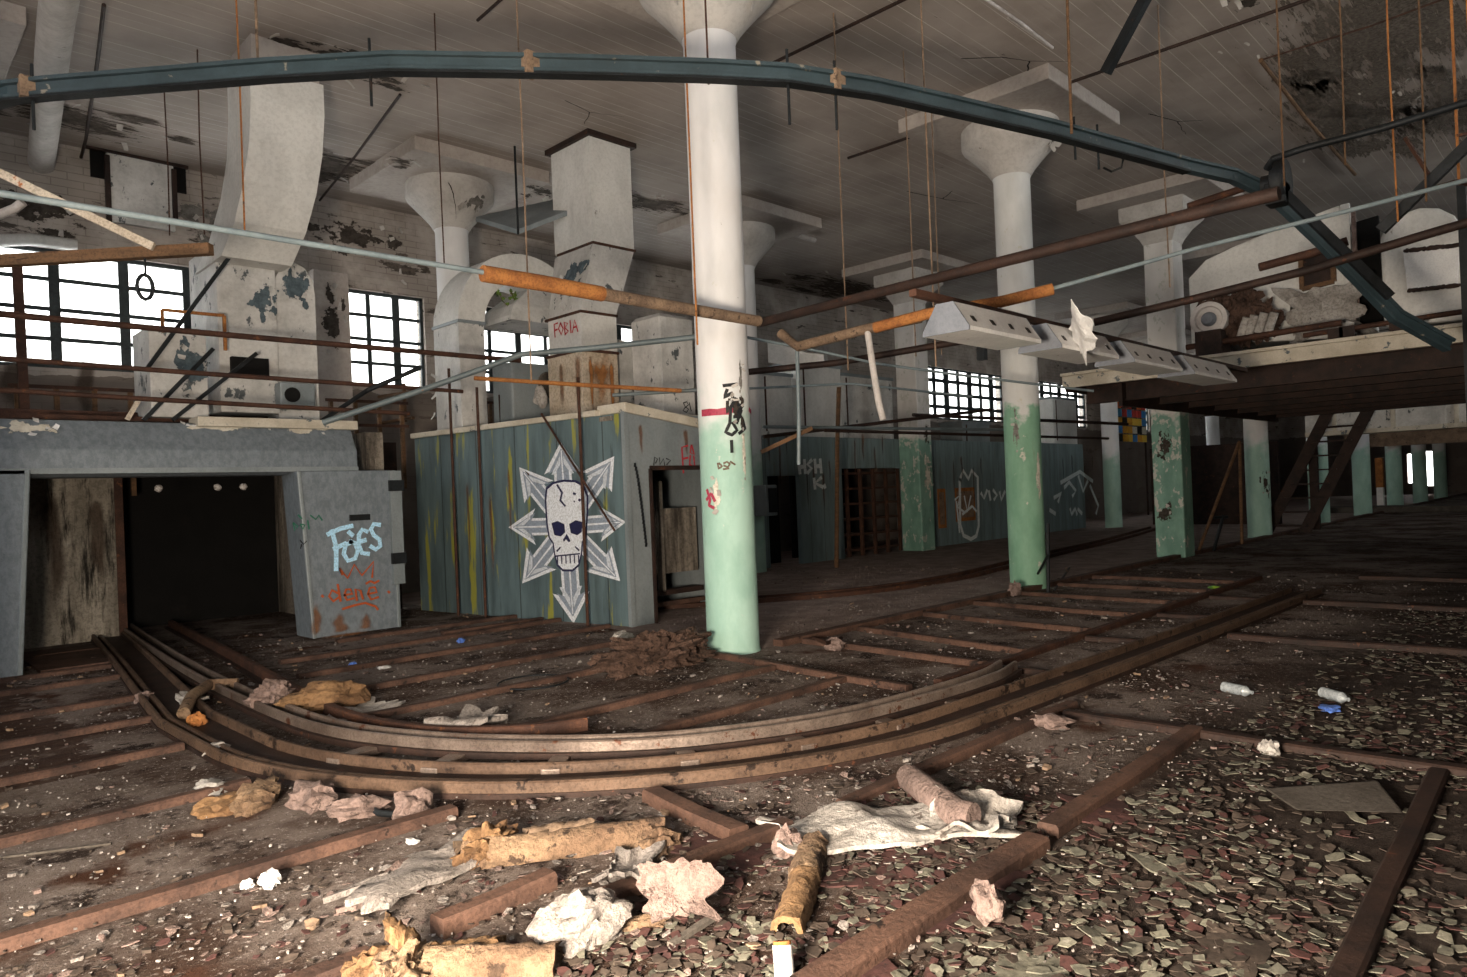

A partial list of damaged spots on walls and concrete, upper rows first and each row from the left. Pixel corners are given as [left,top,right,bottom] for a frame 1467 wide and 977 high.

peeling [1220,0,1467,163]
peeling [0,187,86,238]
peeling [306,216,431,285]